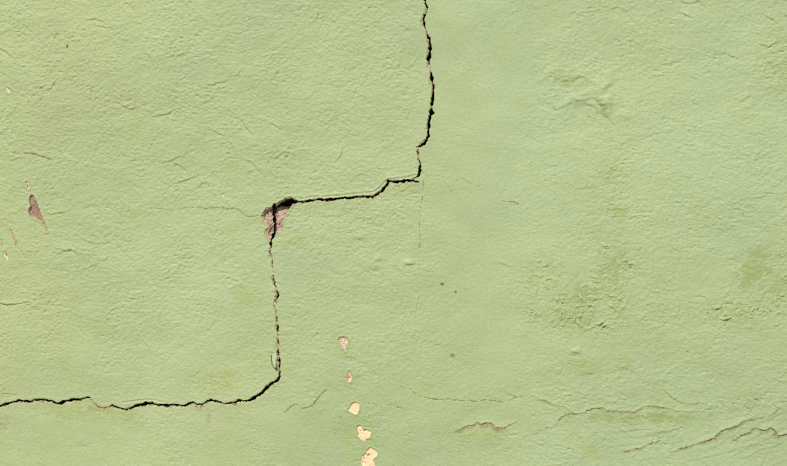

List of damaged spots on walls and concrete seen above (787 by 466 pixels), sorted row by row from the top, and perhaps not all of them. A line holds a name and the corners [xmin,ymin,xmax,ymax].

crack [299,0,435,272]
peeling [25,181,48,232]
spalling [261,197,299,242]
crack [0,203,281,412]
crack [283,389,328,413]
peeling [357,425,378,466]